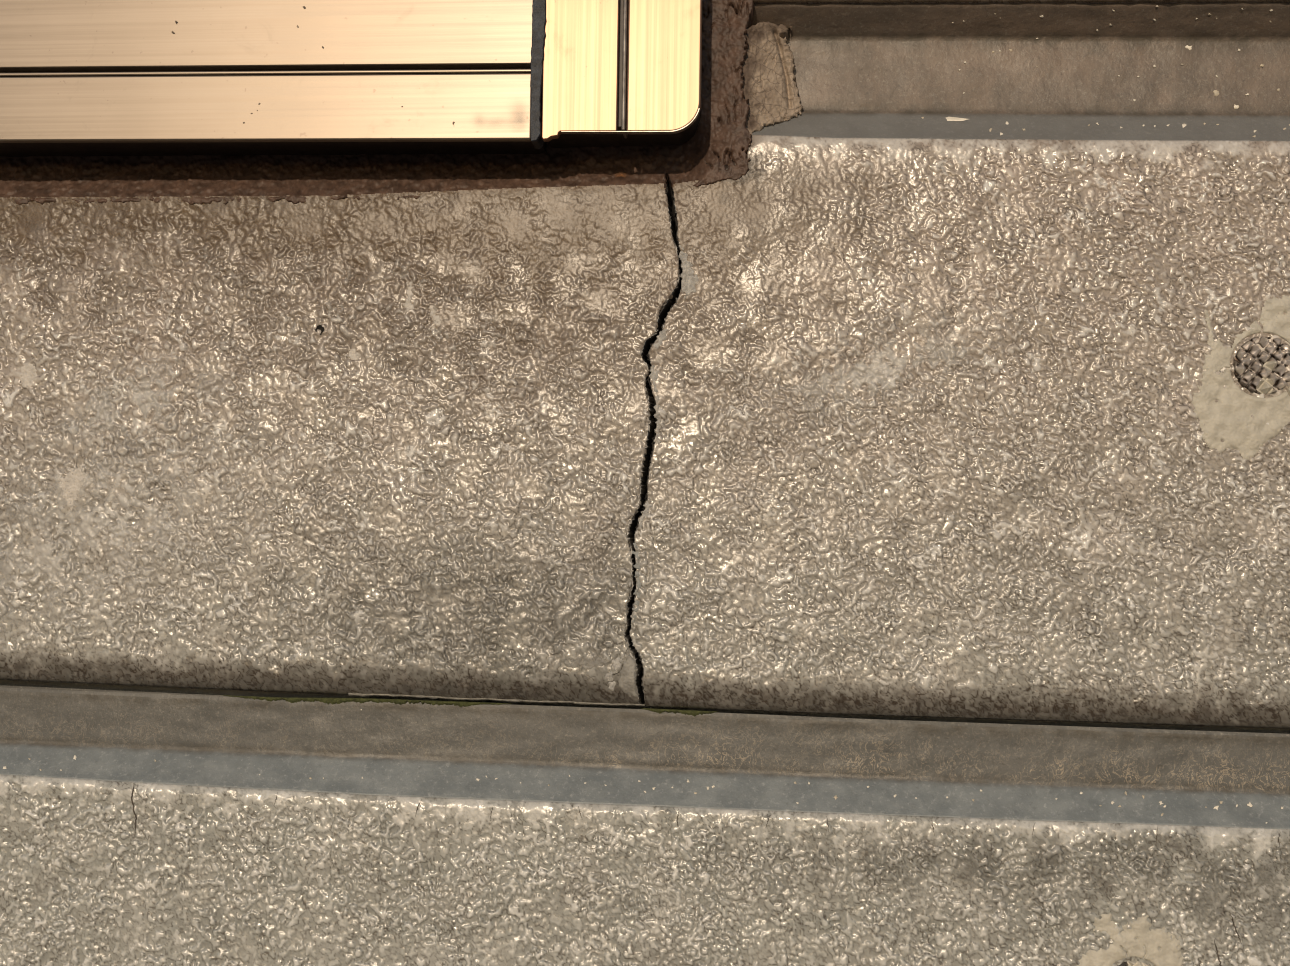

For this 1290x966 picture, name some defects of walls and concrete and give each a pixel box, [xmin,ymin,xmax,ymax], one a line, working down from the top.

crack [611,174,699,706]